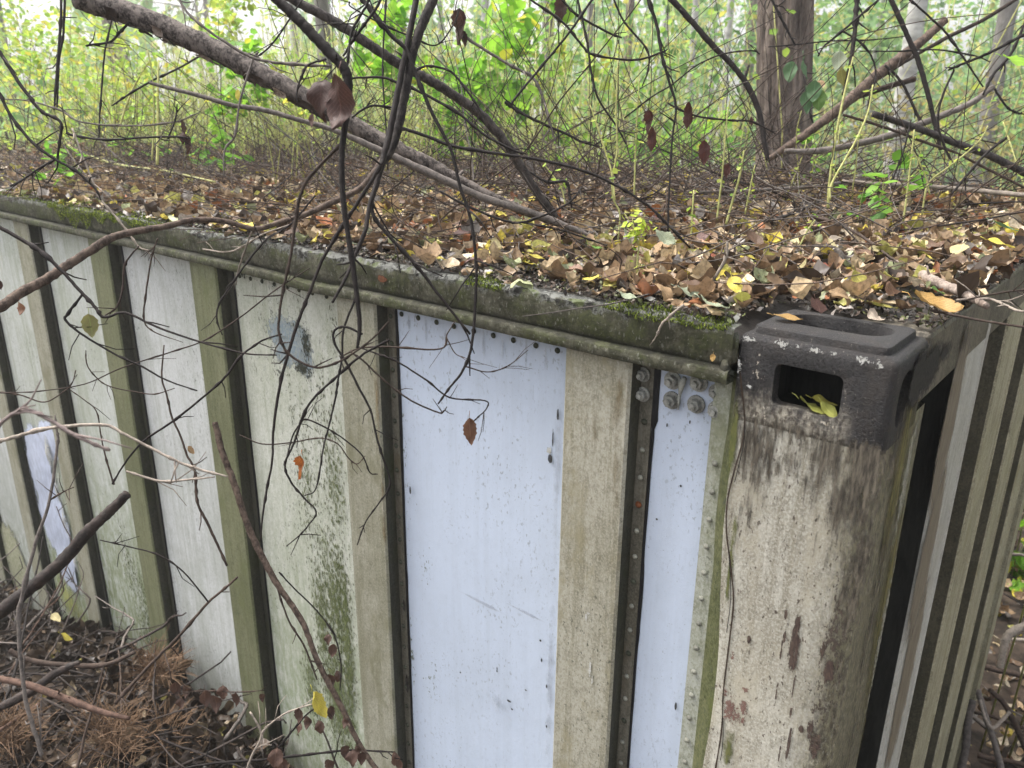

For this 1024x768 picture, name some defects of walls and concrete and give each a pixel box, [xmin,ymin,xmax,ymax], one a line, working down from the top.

damp [290,376,360,765]
rust [723,687,749,725]
damp [738,320,971,699]